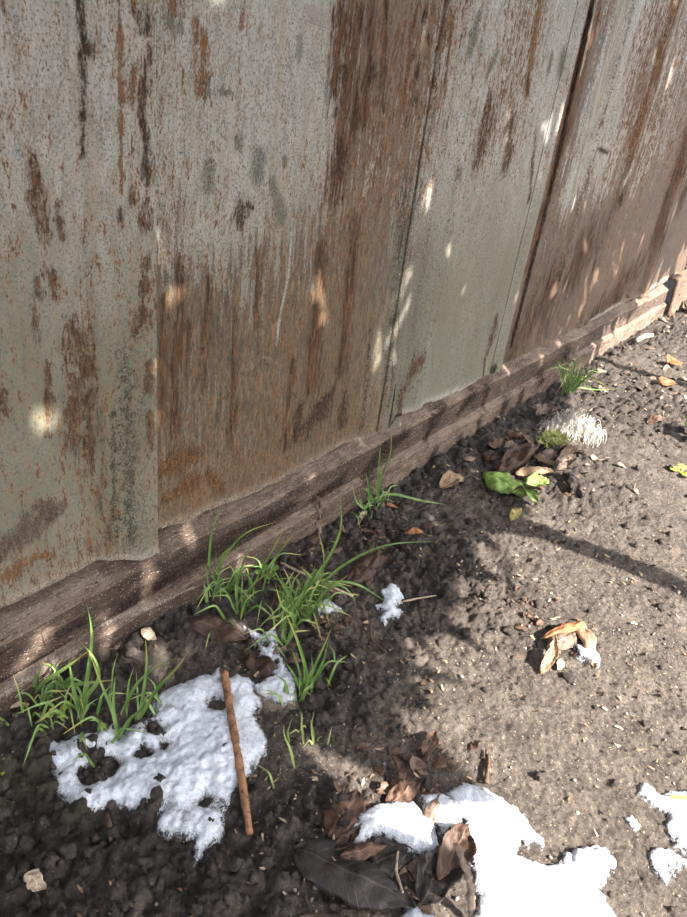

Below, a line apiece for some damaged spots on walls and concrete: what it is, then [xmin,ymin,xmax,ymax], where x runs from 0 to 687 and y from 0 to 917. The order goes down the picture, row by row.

rust [26,147,65,249]
rust [75,0,96,158]
rust [117,0,141,195]
rust [167,0,214,100]
rust [325,0,389,209]
rust [468,0,544,180]
rust [525,0,601,271]
rust [576,132,687,328]
rust [626,0,681,177]
rust [44,313,103,479]
rust [159,256,213,439]
rust [280,211,362,451]